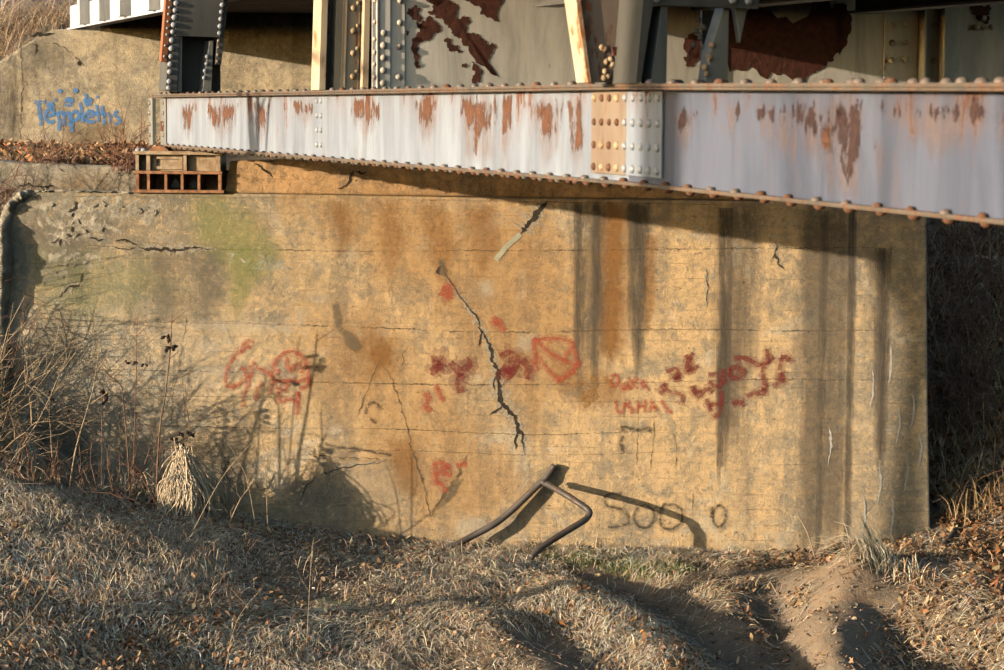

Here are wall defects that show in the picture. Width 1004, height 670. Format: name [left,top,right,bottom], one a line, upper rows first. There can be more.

peeling [406,0,503,84]
peeling [683,33,700,67]
peeling [728,1,852,81]
rust [351,96,379,124]
rust [460,94,512,154]
rust [537,97,583,151]
rust [755,99,862,186]
crack [49,201,217,256]
crack [517,200,548,237]
spalling [0,189,164,420]
crack [436,267,526,453]
crack [358,350,466,515]